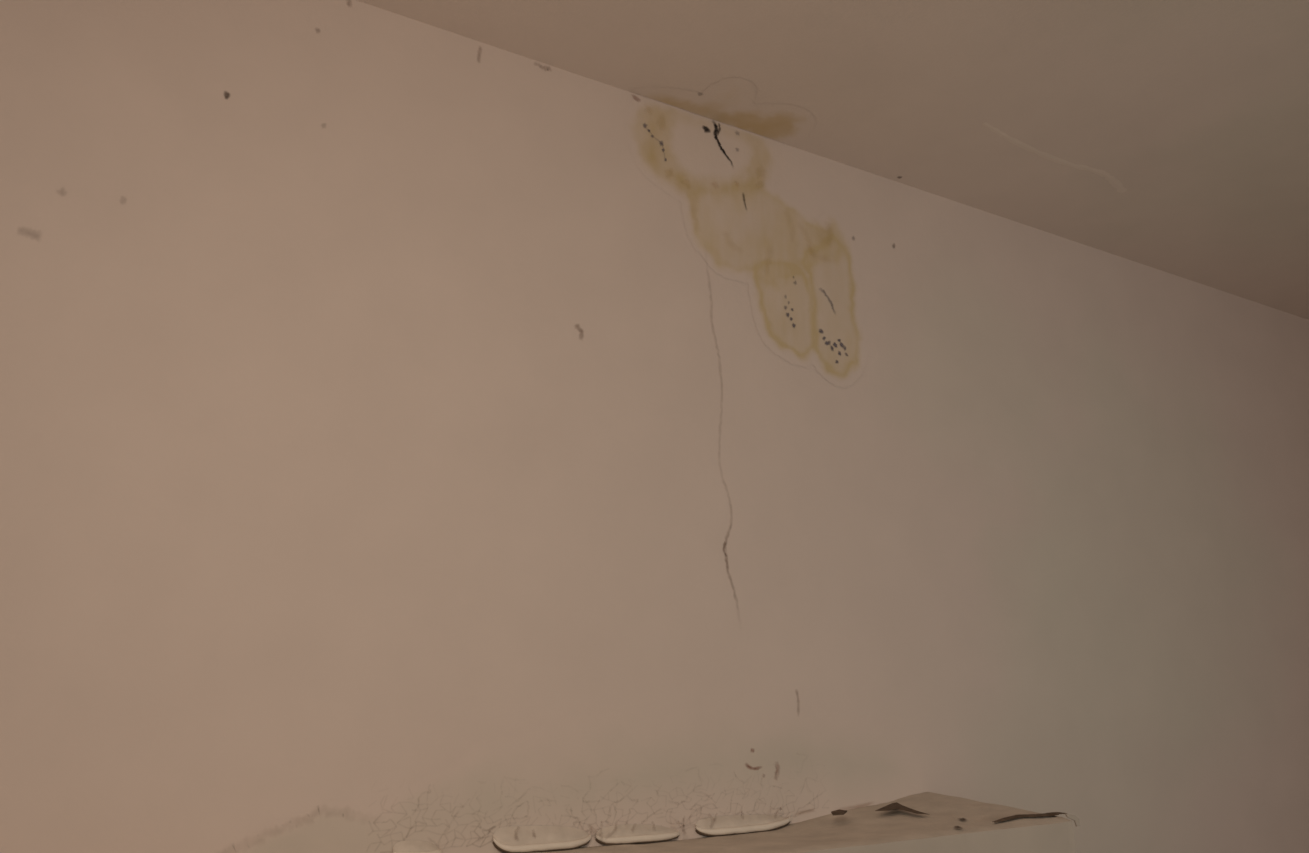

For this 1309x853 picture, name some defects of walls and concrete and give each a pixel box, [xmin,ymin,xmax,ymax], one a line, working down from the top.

leakage [625,77,868,388]
flaking render [875,802,930,815]
peeling [993,812,1080,826]